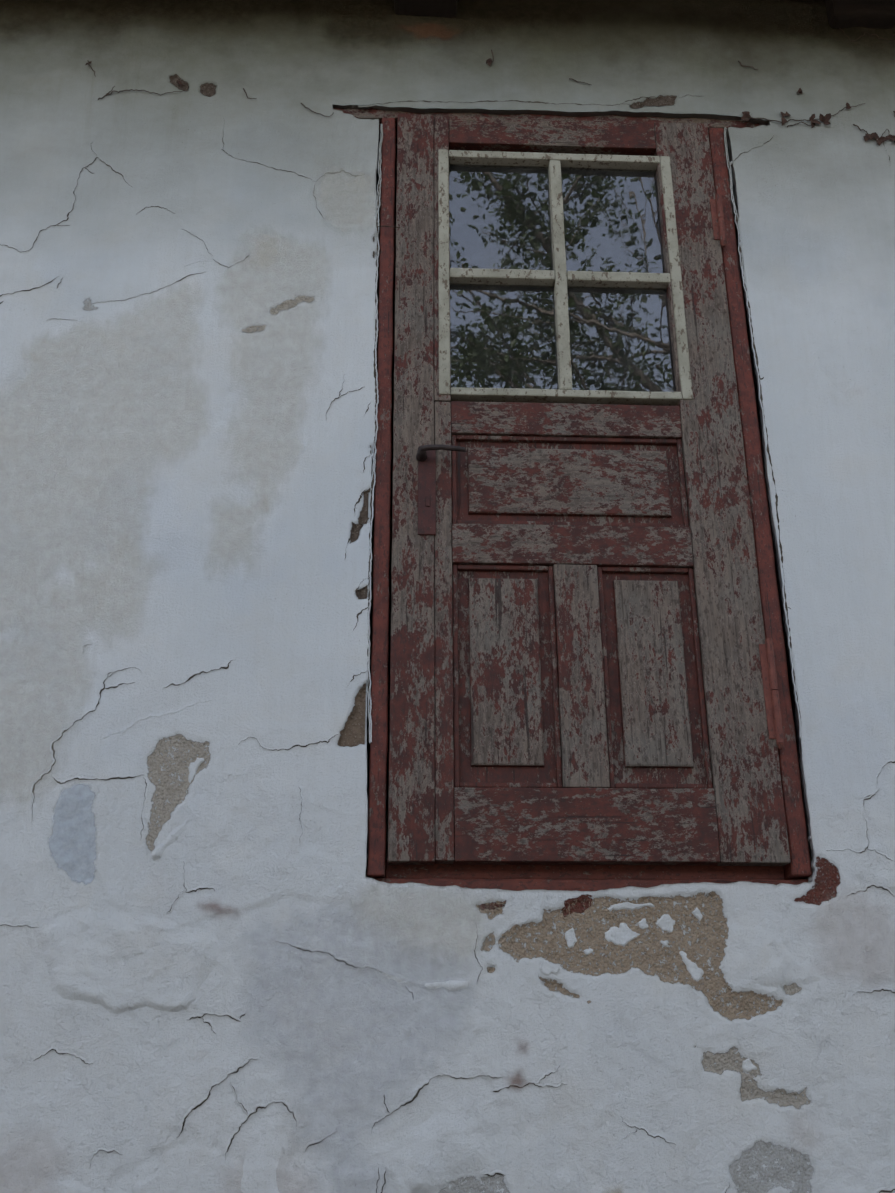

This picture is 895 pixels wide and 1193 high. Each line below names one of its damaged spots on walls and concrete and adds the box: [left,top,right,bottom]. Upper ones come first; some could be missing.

crack [0,141,251,321]
crack [30,659,233,841]
peeling [146,734,210,850]
spalling [338,684,366,747]
crack [826,759,895,897]
spalling [794,856,841,905]
spalling [476,891,802,1021]
crack [186,1011,246,1034]
crack [177,1057,338,1161]
crack [370,1065,567,1134]
spalling [695,1046,810,1109]
spalling [729,1141,813,1193]